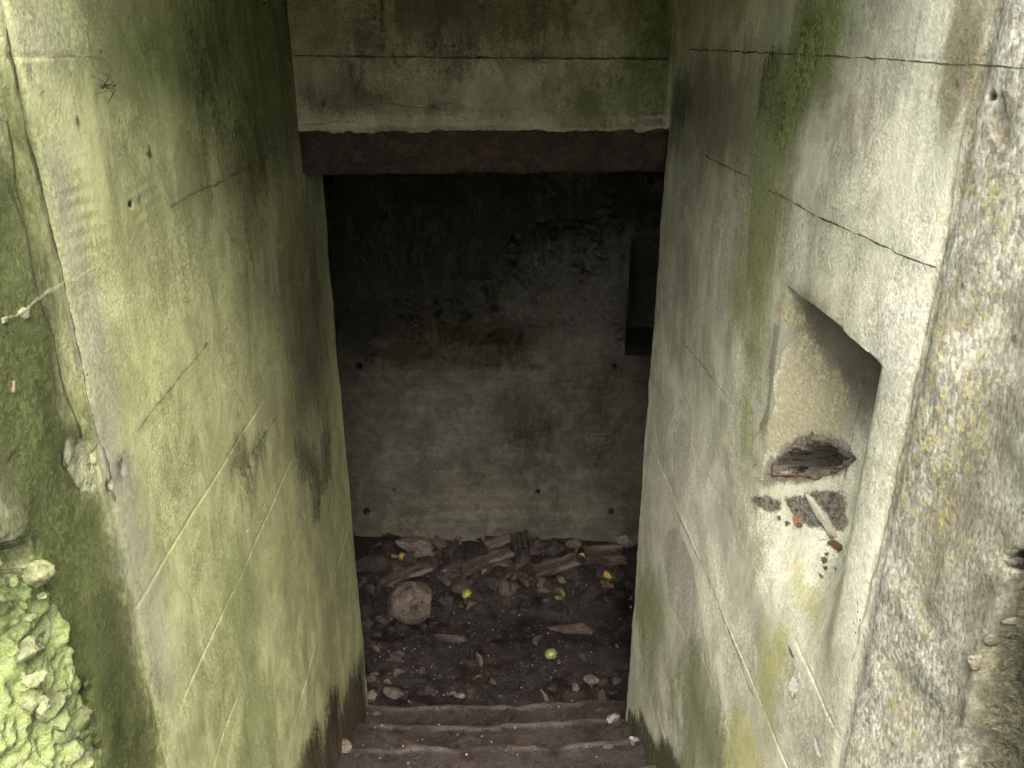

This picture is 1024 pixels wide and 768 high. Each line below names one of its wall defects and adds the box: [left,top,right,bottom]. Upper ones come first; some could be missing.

crack [170,147,278,208]
crack [293,49,1024,660]
damp [294,426,331,524]
spalling [750,490,847,540]
damp [299,663,367,768]